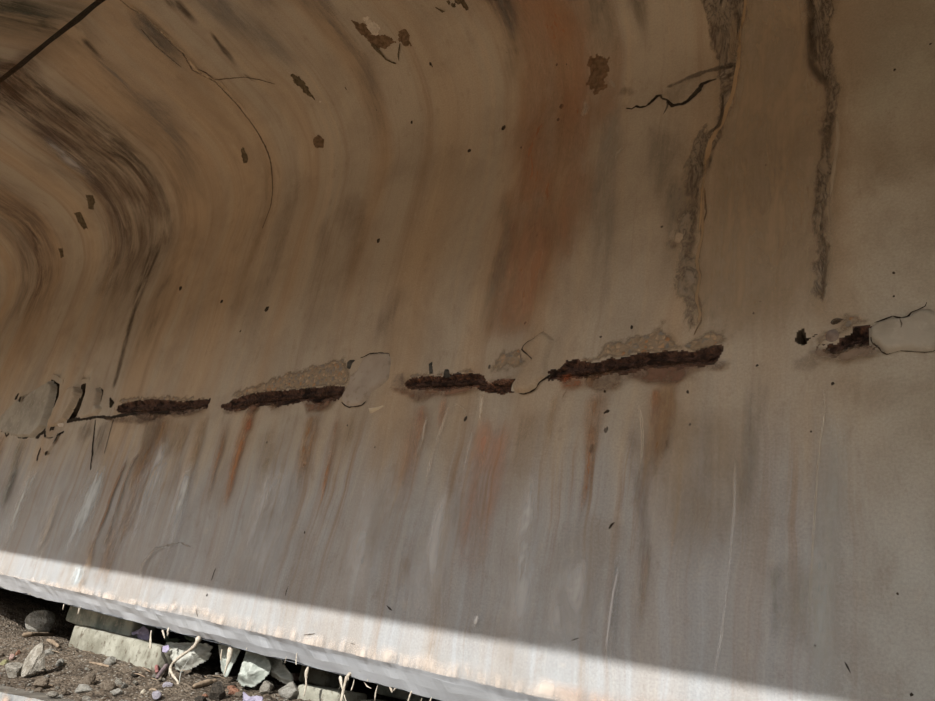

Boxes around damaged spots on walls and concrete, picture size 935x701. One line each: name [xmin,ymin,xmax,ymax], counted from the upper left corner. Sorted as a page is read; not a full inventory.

crack [120,0,274,228]
crack [626,79,716,114]
spalling [107,359,355,426]
spalling [394,350,523,403]
spalling [538,321,735,393]
spalling [805,314,886,368]